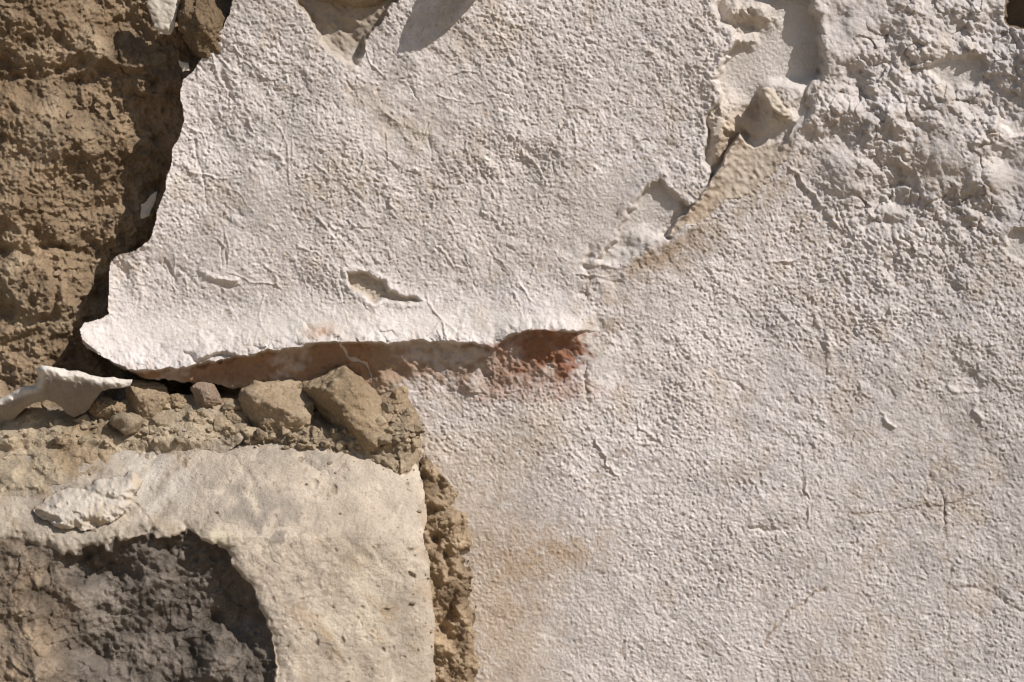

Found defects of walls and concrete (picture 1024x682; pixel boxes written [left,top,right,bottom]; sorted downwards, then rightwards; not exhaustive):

peeling [597,0,1024,265]